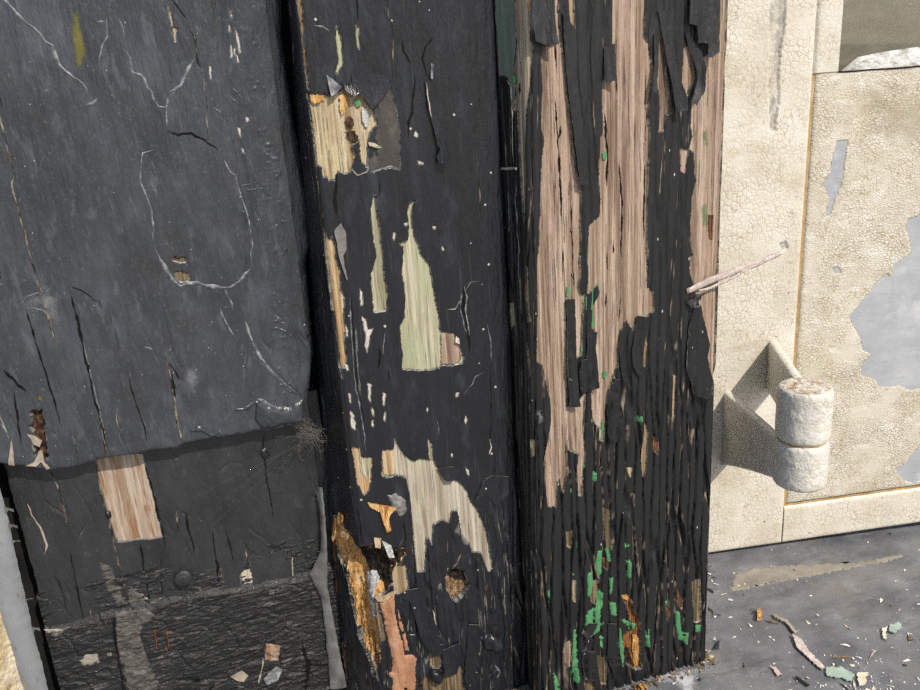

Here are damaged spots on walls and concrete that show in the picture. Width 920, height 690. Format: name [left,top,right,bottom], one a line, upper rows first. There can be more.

crack [166,0,209,141]
crack [0,99,148,465]
peeling [315,163,348,377]
peeling [314,25,401,311]
peeling [362,317,372,349]
peeling [393,201,463,369]
peeling [496,0,726,507]
peeling [849,206,920,390]
peeling [80,454,165,690]
peeling [352,439,509,593]
peeling [418,653,464,690]
peeling [666,578,700,621]